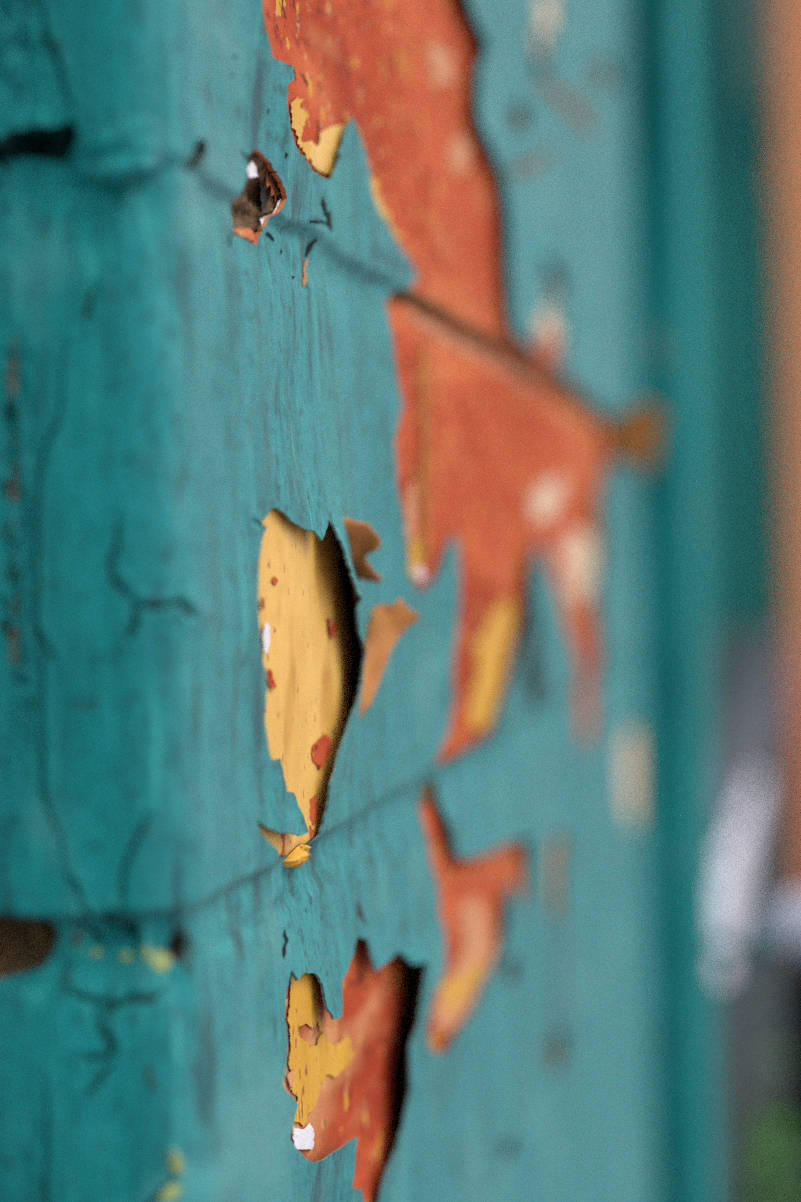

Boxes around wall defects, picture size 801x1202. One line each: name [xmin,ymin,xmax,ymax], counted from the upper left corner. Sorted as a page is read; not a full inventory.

crack [107,515,194,640]
peeling [257,508,419,868]
peeling [229,0,665,766]
peeling [283,780,531,1202]